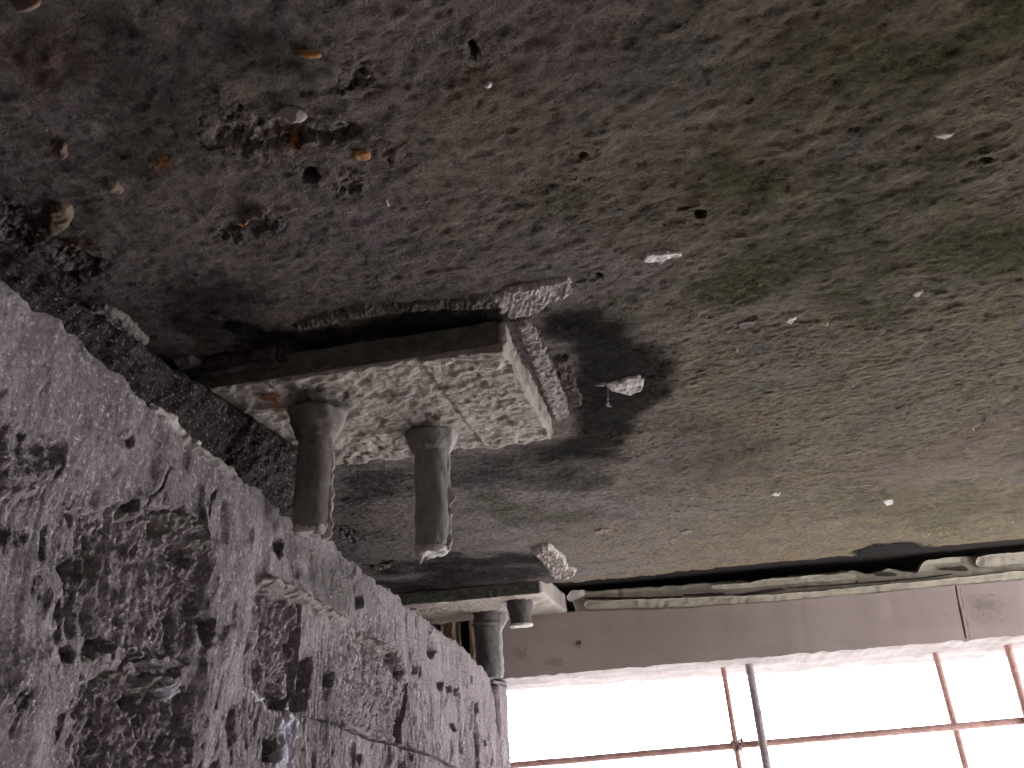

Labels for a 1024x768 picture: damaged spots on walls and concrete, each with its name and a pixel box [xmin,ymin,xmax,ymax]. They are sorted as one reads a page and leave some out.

spalling [197,90,409,204]
spalling [0,187,118,292]
spalling [206,206,289,247]
crack [296,699,480,768]